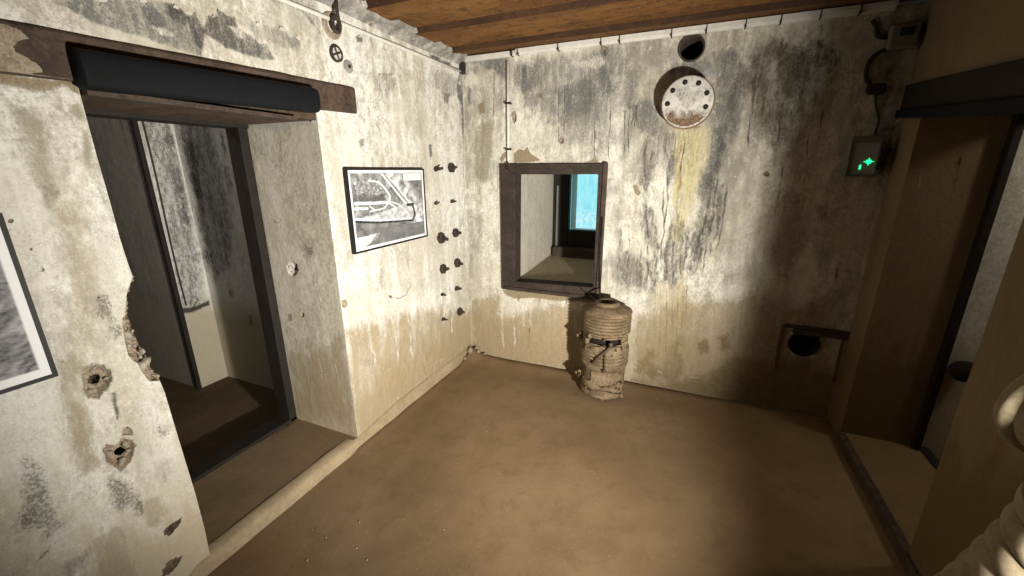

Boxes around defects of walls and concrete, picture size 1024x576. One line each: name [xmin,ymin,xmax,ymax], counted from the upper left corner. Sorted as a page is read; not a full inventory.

peeling [0,24,81,115]
leakage [487,57,508,77]
leakage [457,75,471,177]
rust [666,110,708,241]
leakage [519,39,836,418]
spalling [60,355,113,418]
spalling [97,276,160,381]
leakage [289,283,595,430]
spalling [103,426,137,472]